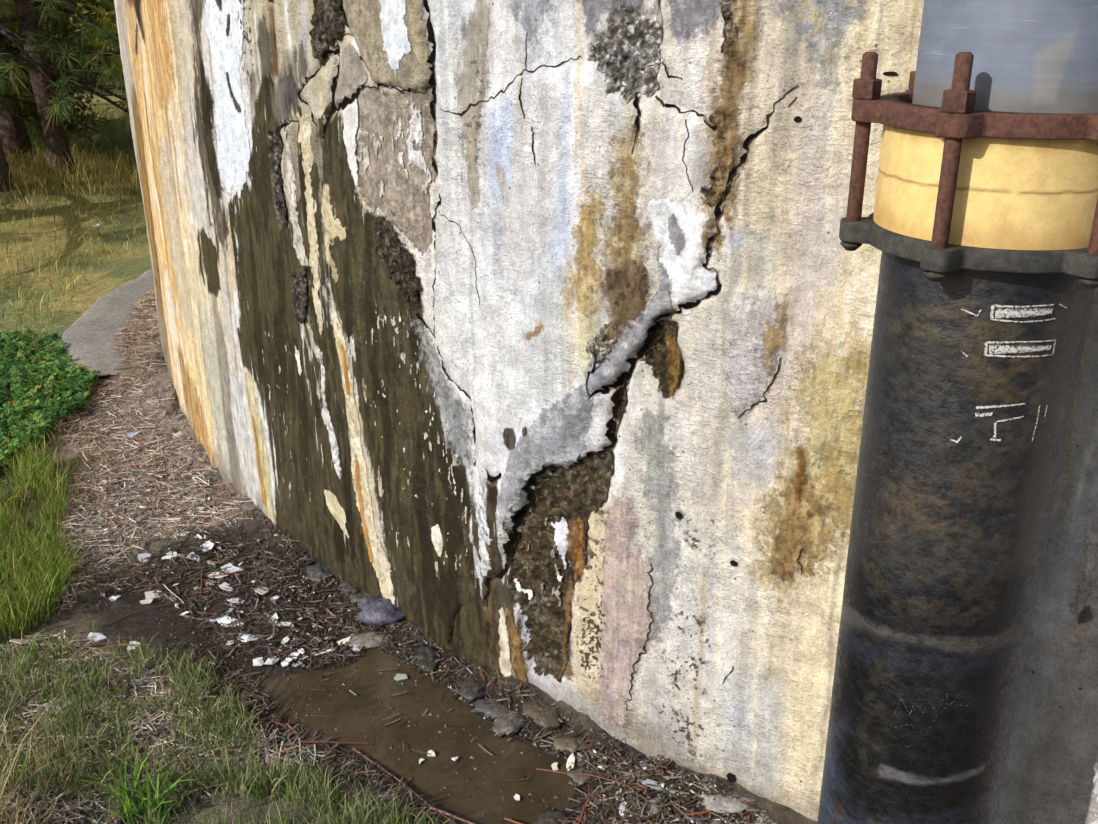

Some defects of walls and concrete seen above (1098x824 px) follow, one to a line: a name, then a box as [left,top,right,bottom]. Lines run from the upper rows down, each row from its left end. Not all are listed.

corrosion [134,91,163,321]
corrosion [146,0,175,114]
corrosion [268,0,279,75]
corrosion [701,0,764,252]
corrosion [177,344,217,468]
corrosion [227,370,276,525]
water stain [189,0,529,682]
spalling [267,0,738,732]
crack [275,0,799,646]
corrosion [763,298,789,375]
corrosion [750,314,871,612]
spalling [659,657,709,760]